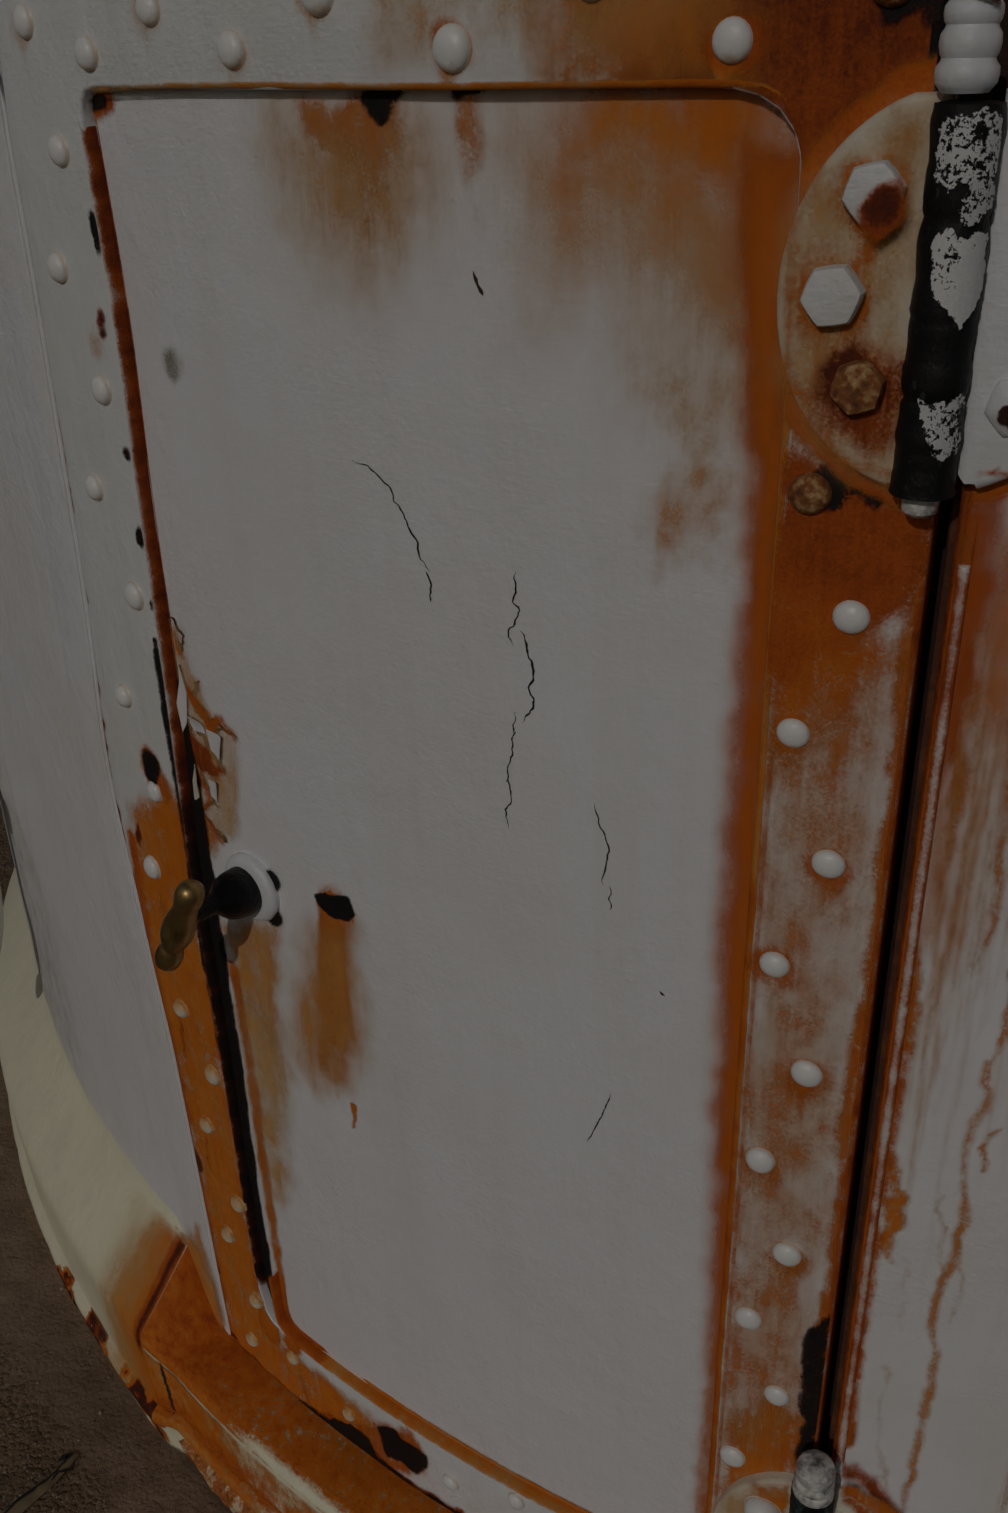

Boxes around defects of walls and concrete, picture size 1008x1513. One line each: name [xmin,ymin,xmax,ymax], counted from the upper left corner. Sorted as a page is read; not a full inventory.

corrosion [807,125,919,296]
peeling [930,106,1003,330]
corrosion [794,273,904,458]
peeling [917,394,966,462]
peeling [997,405,1008,427]
crack [352,460,432,602]
crack [504,572,535,828]
corrosion [82,122,590,1513]
corrosion [714,501,941,1496]
corrosion [831,471,1008,1513]
corrosion [727,1485,789,1513]